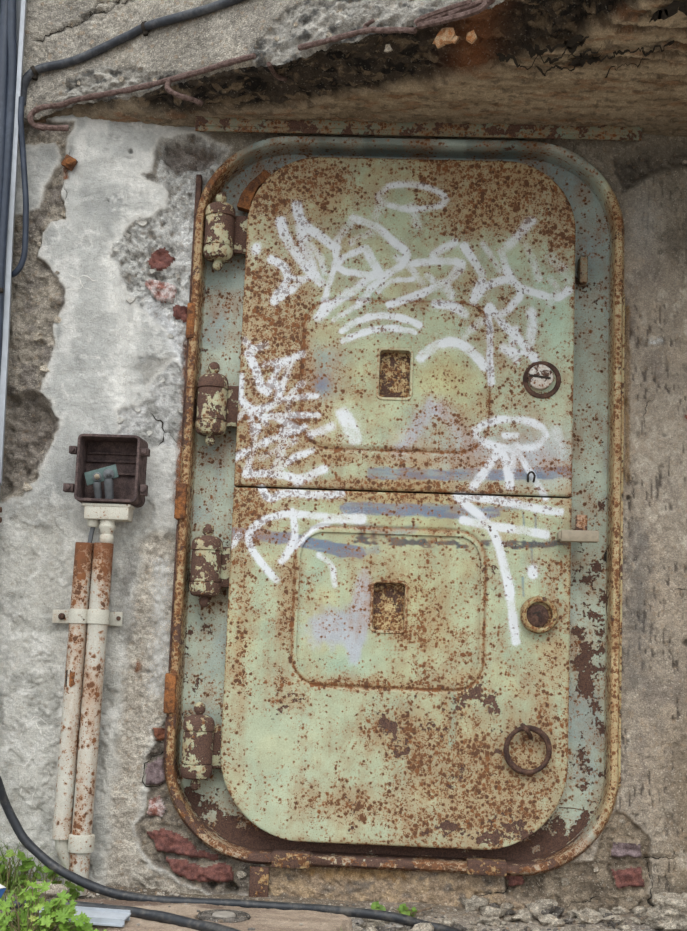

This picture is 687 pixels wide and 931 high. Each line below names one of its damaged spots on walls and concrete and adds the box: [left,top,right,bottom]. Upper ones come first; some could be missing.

crack [31,0,132,42]
spalling [0,0,641,503]
spalling [612,142,687,194]
flaking render [134,723,261,896]